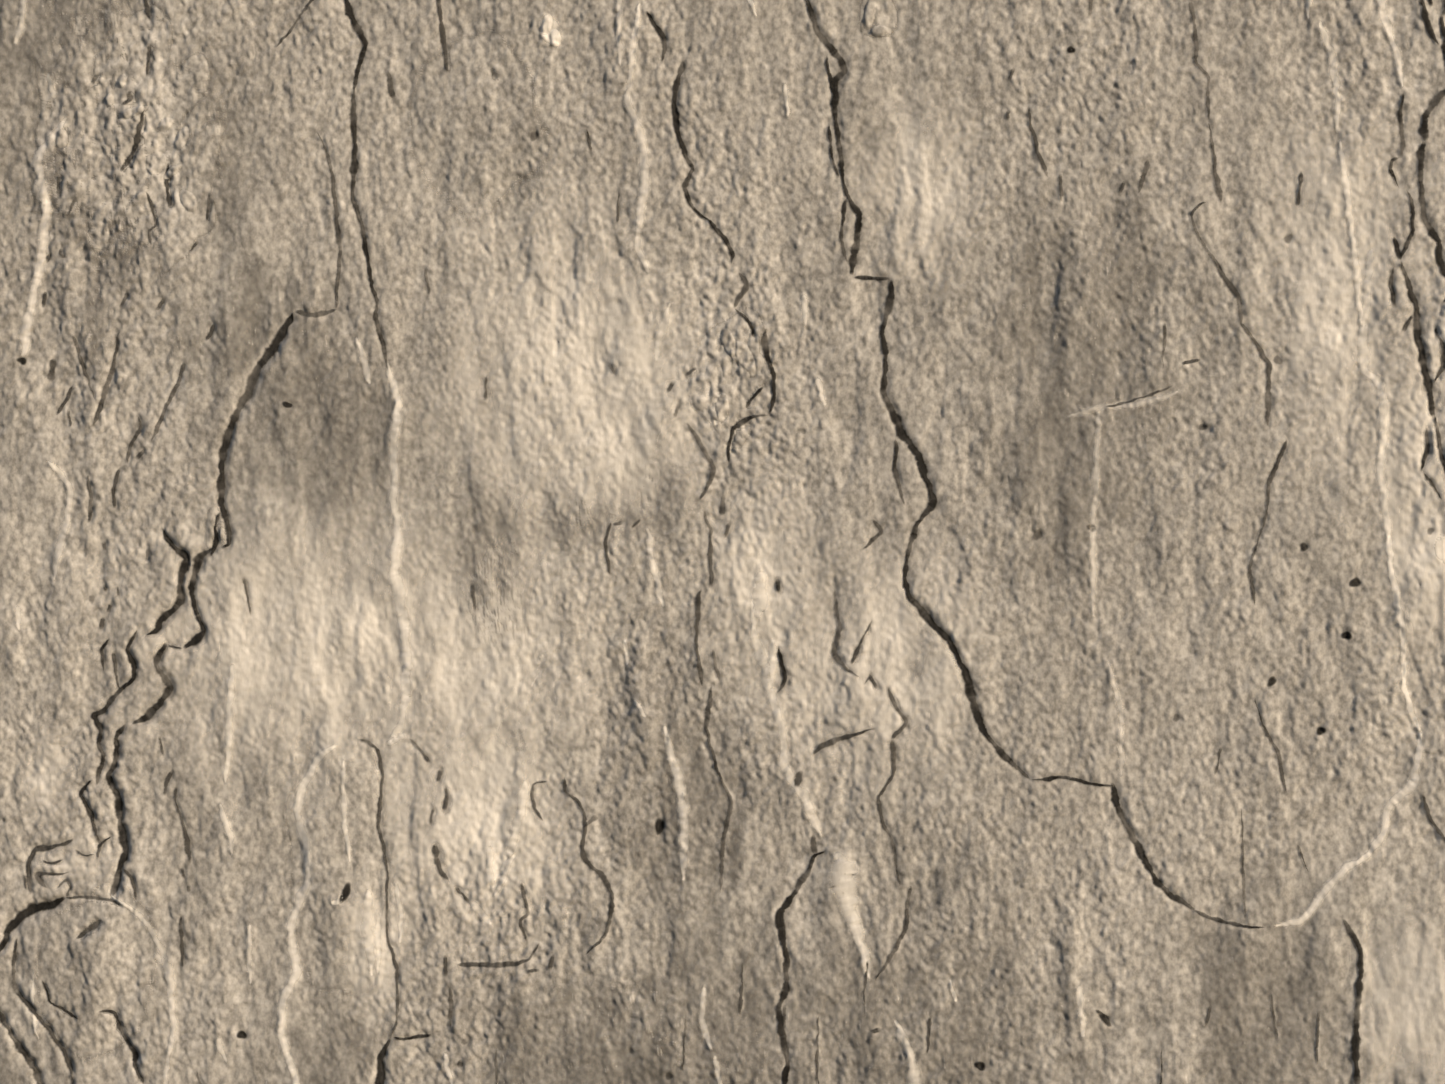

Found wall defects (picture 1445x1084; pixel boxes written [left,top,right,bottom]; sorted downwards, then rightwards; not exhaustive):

crack [436,0,448,70]
crack [1420,0,1445,54]
crack [0,0,395,1084]
crack [361,739,615,1084]
crack [647,11,776,874]
crack [739,837,824,1084]
crack [794,601,912,1033]
crack [805,0,1263,928]
crack [1190,9,1287,604]
crack [1255,700,1286,791]
crack [1315,920,1364,1084]
crack [1389,90,1445,498]